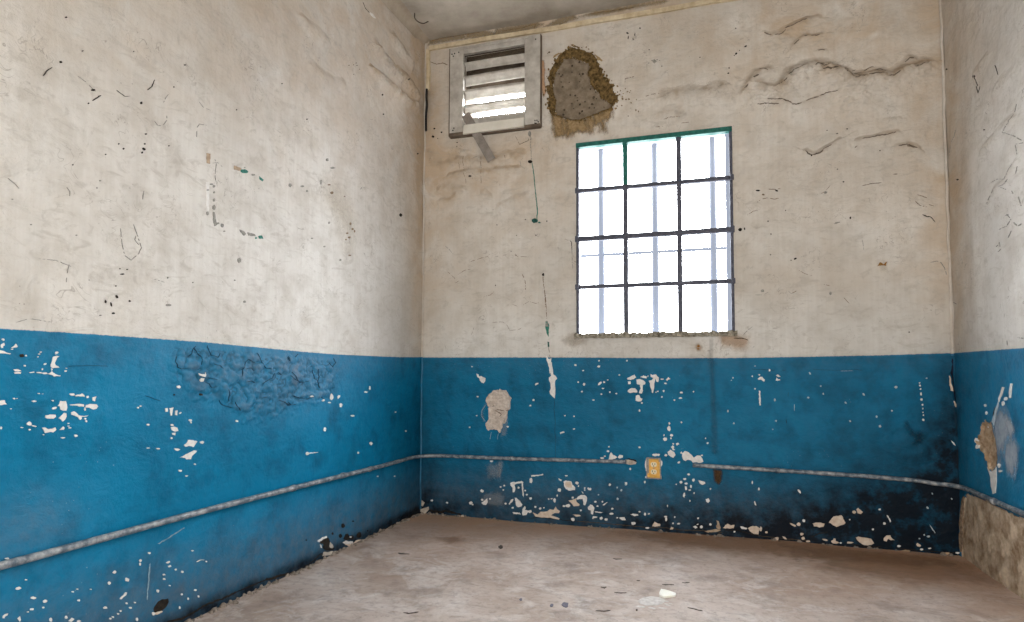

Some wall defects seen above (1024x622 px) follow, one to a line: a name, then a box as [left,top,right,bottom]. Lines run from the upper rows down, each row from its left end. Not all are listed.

spalling [545,44,623,123]
crack [718,18,947,105]
crack [805,128,918,194]
peeling [20,393,98,439]
peeling [165,407,204,477]
spalling [471,366,512,433]
peeling [535,356,557,398]
peeling [593,374,694,412]
peeling [500,446,680,530]
spalling [945,383,1024,599]
peeling [693,517,786,540]